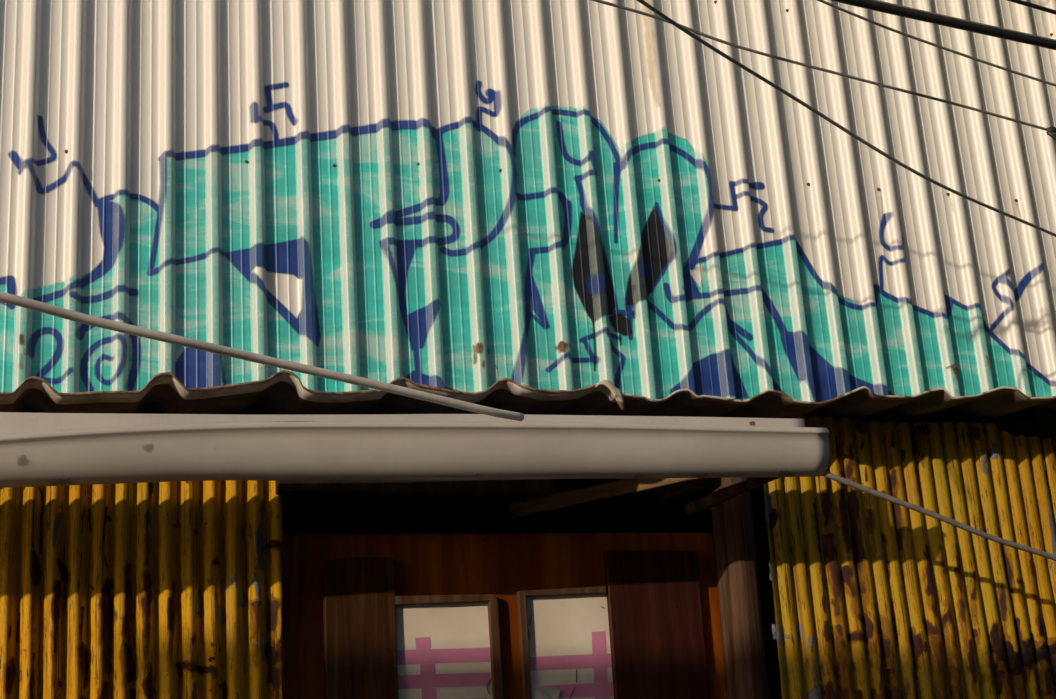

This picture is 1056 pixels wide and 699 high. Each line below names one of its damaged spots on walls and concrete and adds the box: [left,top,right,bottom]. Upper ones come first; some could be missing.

corrosion [0,333,601,396]
corrosion [3,656,16,699]
corrosion [30,486,44,622]
corrosion [50,482,156,699]
corrosion [167,580,228,699]
peeling [196,589,204,618]
peeling [217,605,225,626]
peeling [232,499,264,607]
corrosion [250,596,285,699]
peeling [772,622,823,699]
corrosion [799,421,1056,699]
peeling [1043,460,1056,573]